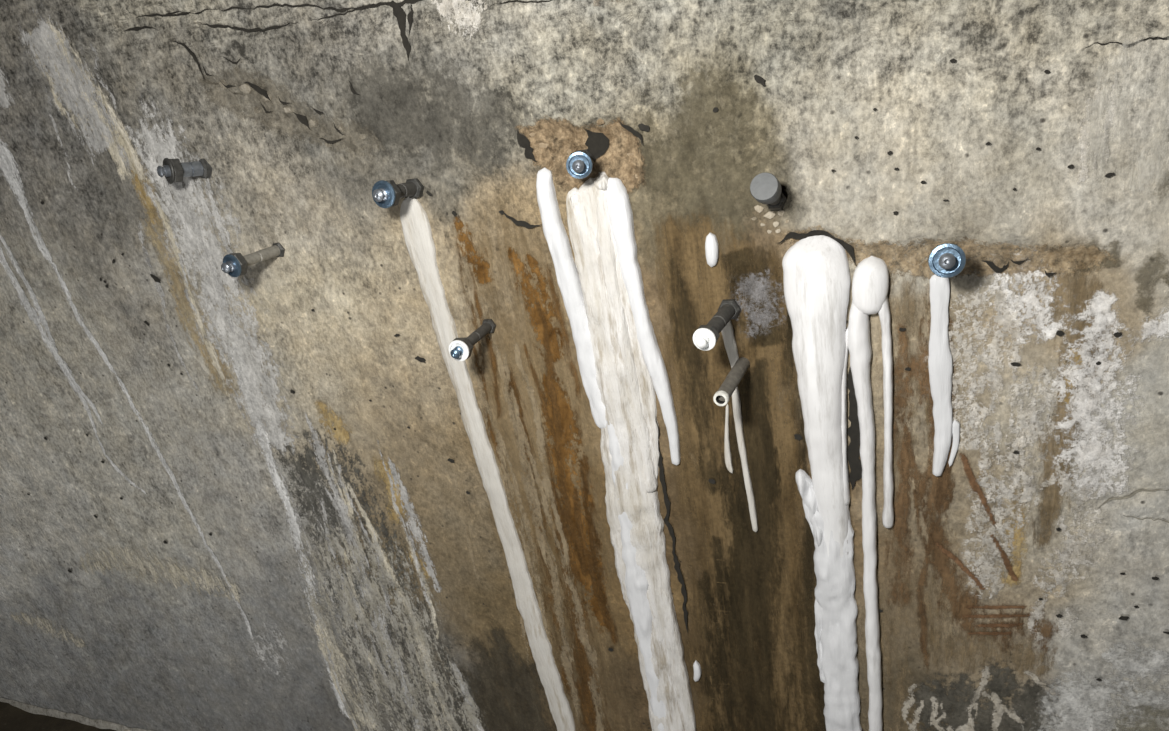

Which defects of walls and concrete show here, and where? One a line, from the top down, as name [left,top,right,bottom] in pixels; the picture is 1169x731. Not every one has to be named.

crack [125,0,421,95]
crack [465,0,551,8]
crack [1085,36,1169,48]
leakage [1081,241,1121,271]
leakage [0,11,576,731]
rust [454,214,632,731]
leakage [536,69,894,731]
rust [879,270,1058,731]
leakage [928,249,1169,640]
crack [1098,489,1169,523]
leakage [902,641,1169,731]